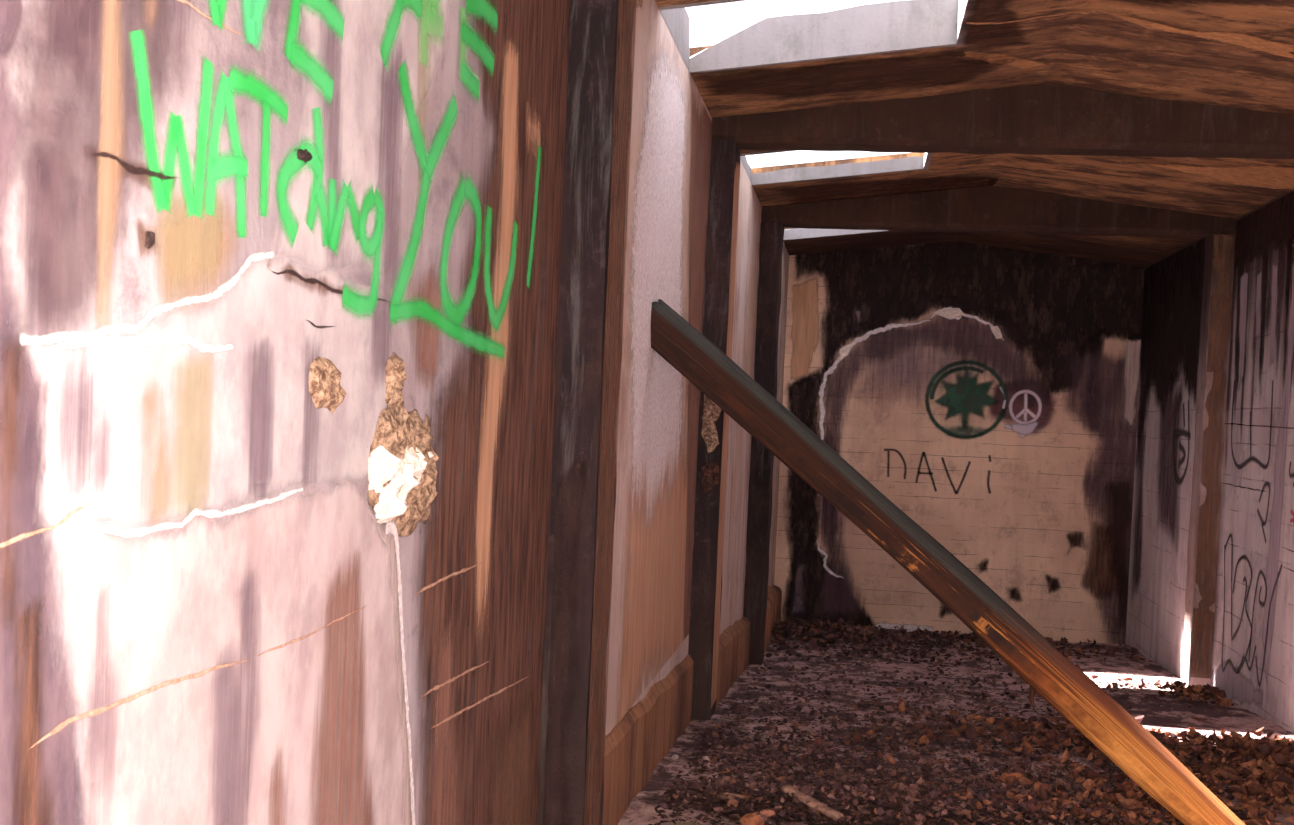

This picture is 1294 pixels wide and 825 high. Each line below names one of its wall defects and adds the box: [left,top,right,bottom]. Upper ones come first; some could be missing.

damp [1109,0,1294,59]
damp [1147,164,1294,189]
damp [617,0,1090,725]
damp [1086,337,1104,358]
peeling [18,251,439,825]
spalling [701,394,722,493]
damp [1133,385,1182,592]
damp [1227,241,1294,677]
damp [1211,662,1261,703]